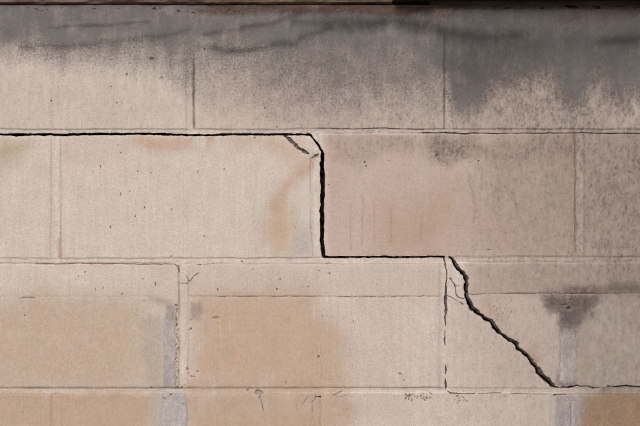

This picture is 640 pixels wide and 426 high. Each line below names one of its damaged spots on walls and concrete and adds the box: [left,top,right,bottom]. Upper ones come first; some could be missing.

leakage [200,5,429,27]
crack [0,127,640,396]
leakage [545,294,595,328]